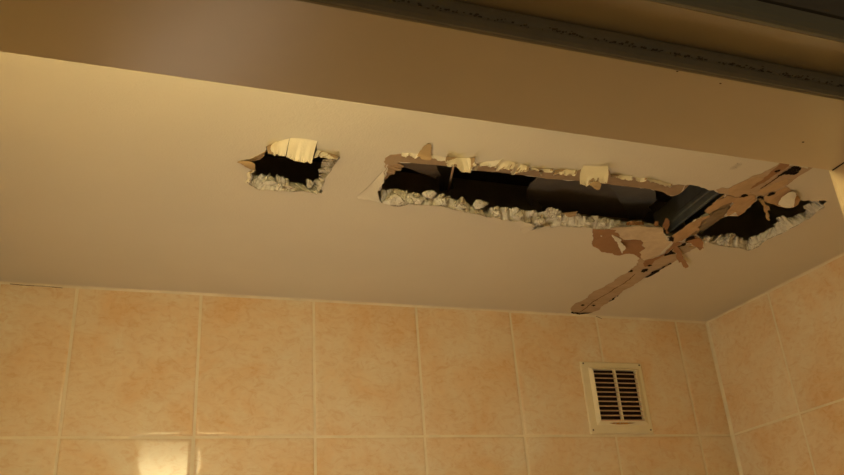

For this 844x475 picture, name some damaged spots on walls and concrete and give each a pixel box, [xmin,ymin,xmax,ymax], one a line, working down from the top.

spalling [249,157,340,194]
peeling [717,163,812,197]
spalling [380,188,682,313]
spalling [702,201,824,251]